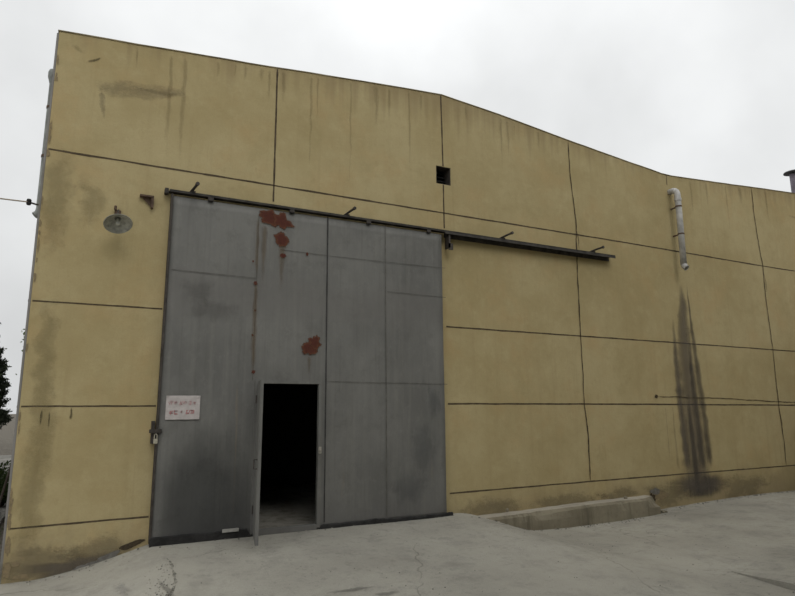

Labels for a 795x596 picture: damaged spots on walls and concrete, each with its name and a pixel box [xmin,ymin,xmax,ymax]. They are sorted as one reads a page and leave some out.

corrosion [259,210,295,258]
corrosion [301,335,322,355]
leakage [674,297,720,495]